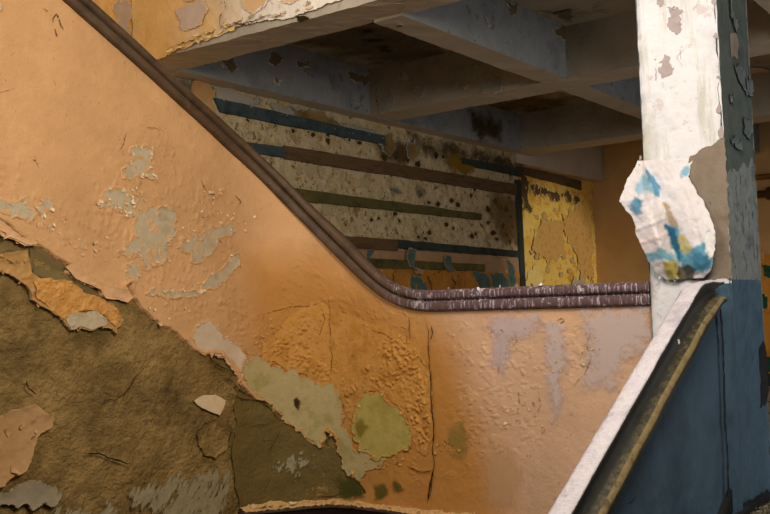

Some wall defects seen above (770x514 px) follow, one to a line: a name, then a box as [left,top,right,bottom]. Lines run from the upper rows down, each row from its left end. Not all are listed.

peeling [156,0,313,60]
peeling [729,0,755,97]
peeling [619,117,754,281]
peeling [760,251,770,279]
spalling [0,142,421,514]
crack [371,320,435,502]
leakage [493,315,566,423]